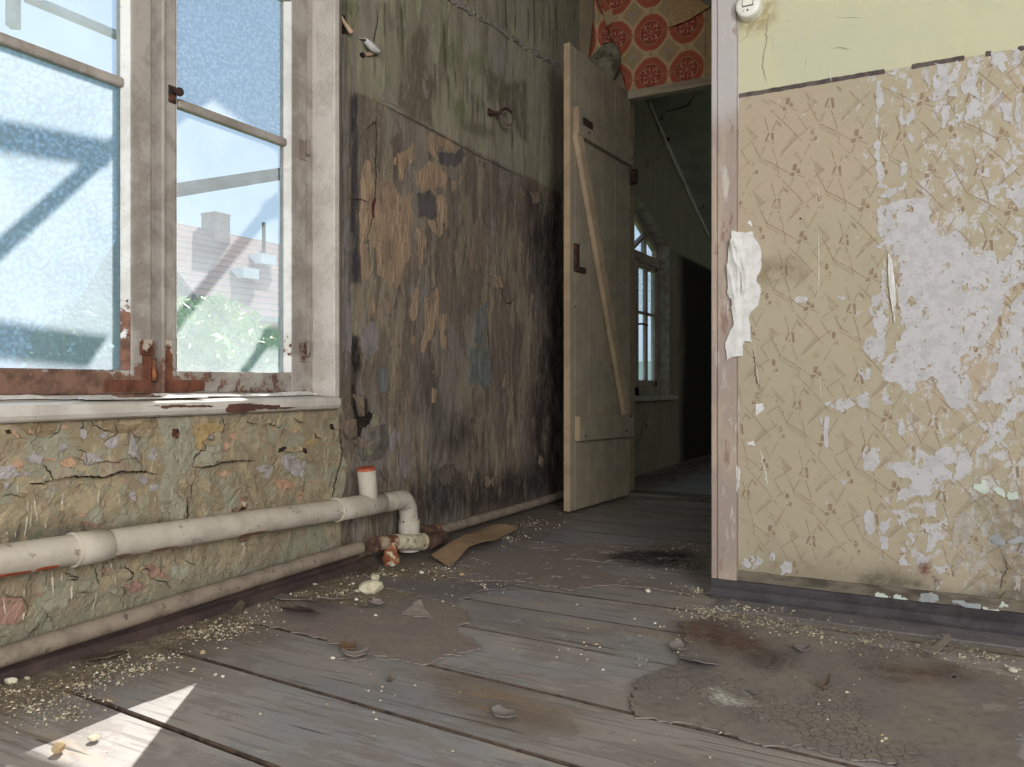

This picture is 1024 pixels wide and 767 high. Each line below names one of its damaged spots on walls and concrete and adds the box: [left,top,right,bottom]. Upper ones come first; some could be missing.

peeling [889,66,985,129]
peeling [342,133,465,360]
spalling [887,251,896,322]
flaking render [352,398,373,437]
crack [2,420,157,498]
crack [184,412,343,519]
crack [1,591,55,636]
crack [64,566,170,597]
damp [609,550,690,566]
peeling [769,552,793,576]
flaking render [875,518,953,603]
flaking render [952,600,1009,611]